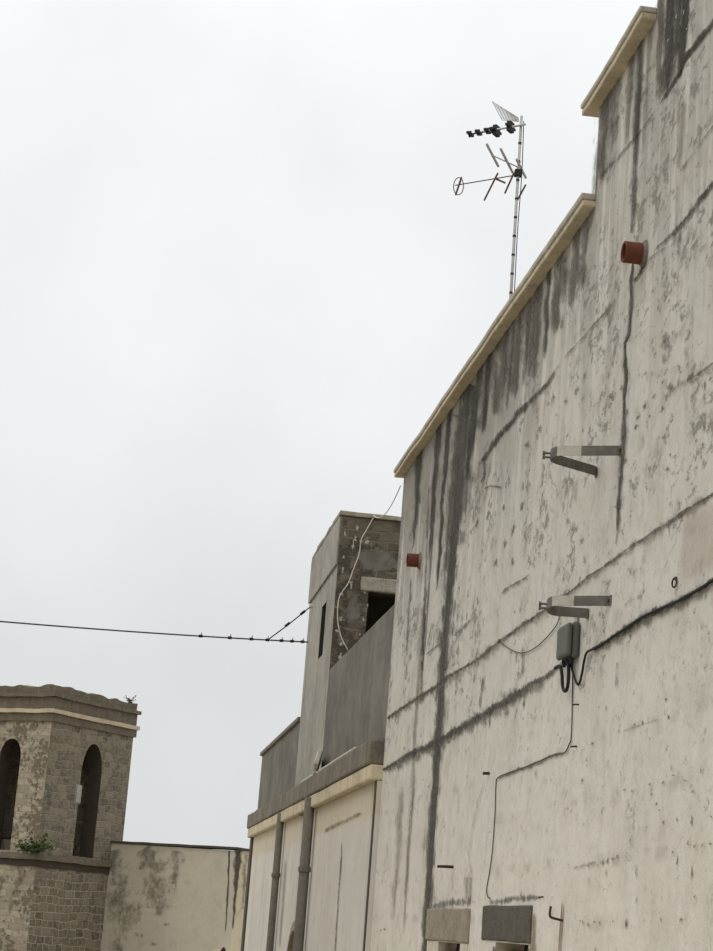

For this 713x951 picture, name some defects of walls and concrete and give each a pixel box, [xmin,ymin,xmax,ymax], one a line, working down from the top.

crack [599,20,713,177]
water stain [406,0,689,951]
crack [382,182,713,771]